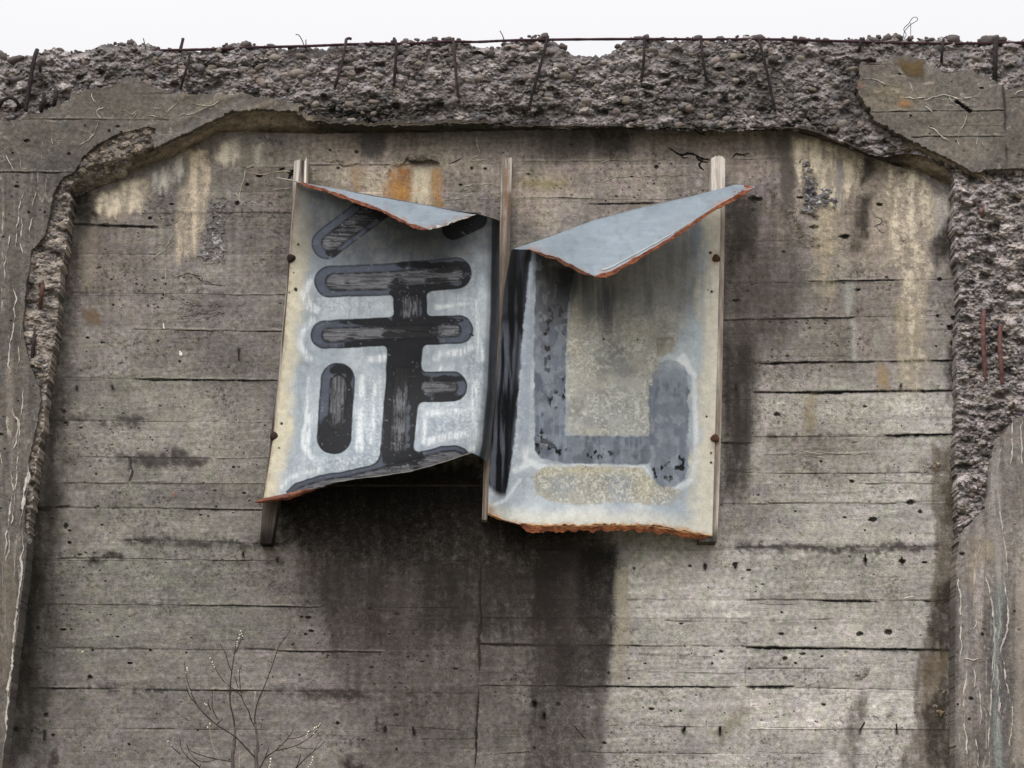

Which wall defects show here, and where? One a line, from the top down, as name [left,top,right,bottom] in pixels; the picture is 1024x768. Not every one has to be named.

leakage [65,139,239,324]
spalling [0,33,1024,542]
leakage [726,199,794,495]
leakage [1,344,70,763]
leakage [281,456,630,768]